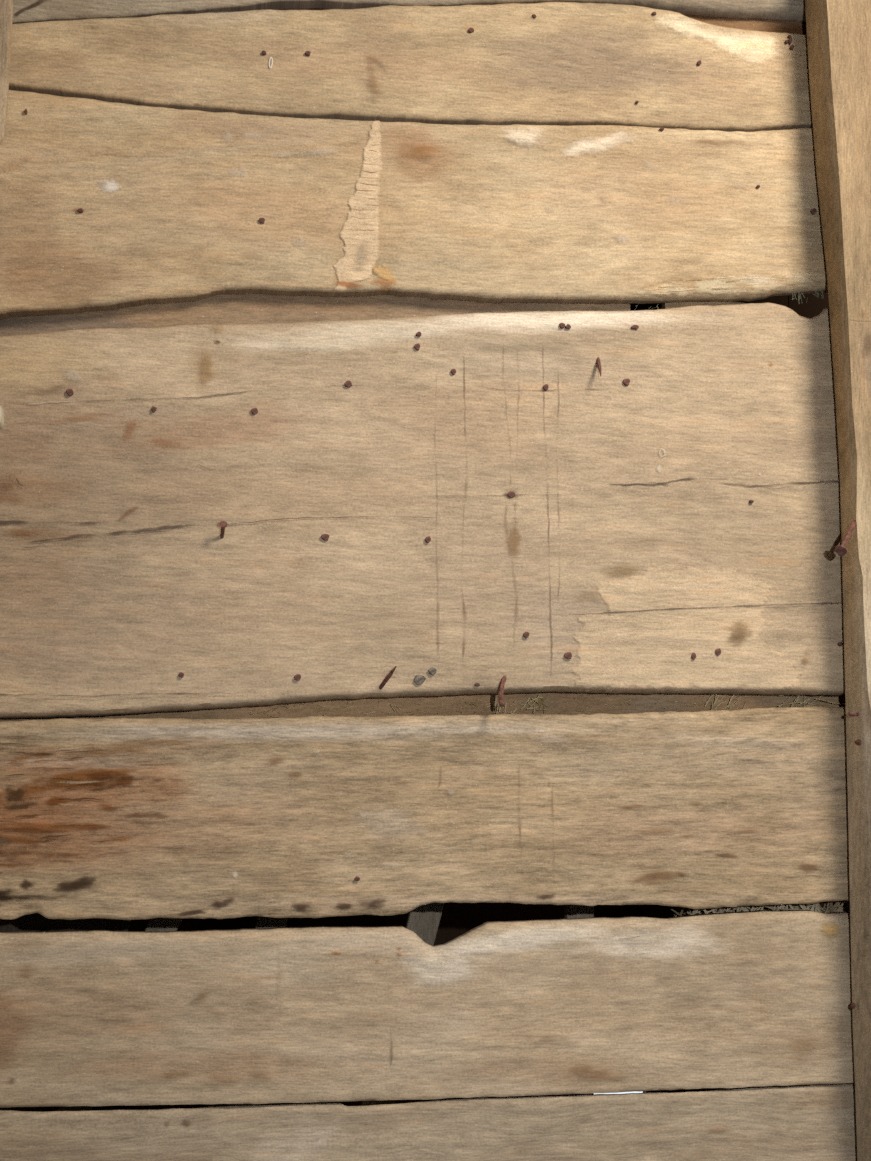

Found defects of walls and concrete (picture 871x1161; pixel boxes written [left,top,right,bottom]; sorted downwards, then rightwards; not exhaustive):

crack [611,478,692,486]
crack [725,480,839,488]
crack [227,516,379,525]
crack [0,520,193,548]
crack [580,602,838,615]
rust [0,743,159,873]